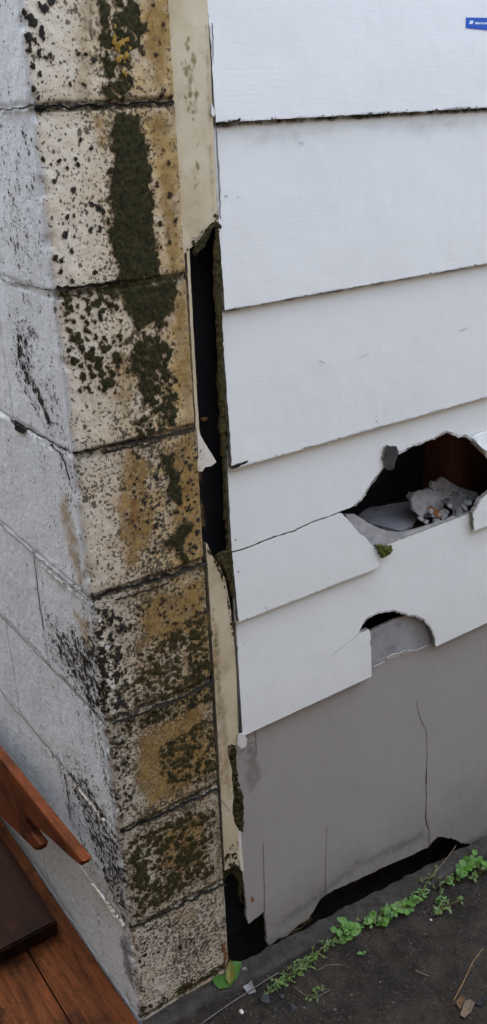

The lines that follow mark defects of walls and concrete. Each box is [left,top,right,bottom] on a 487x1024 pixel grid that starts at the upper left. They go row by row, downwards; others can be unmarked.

water stain [1,131,43,274]
water stain [7,288,60,438]
water stain [61,503,80,582]
water stain [173,442,201,550]
peeling [196,429,216,471]
water stain [44,611,120,727]
water stain [140,582,206,648]
water stain [136,710,206,802]
water stain [56,753,133,927]
water stain [163,817,201,871]